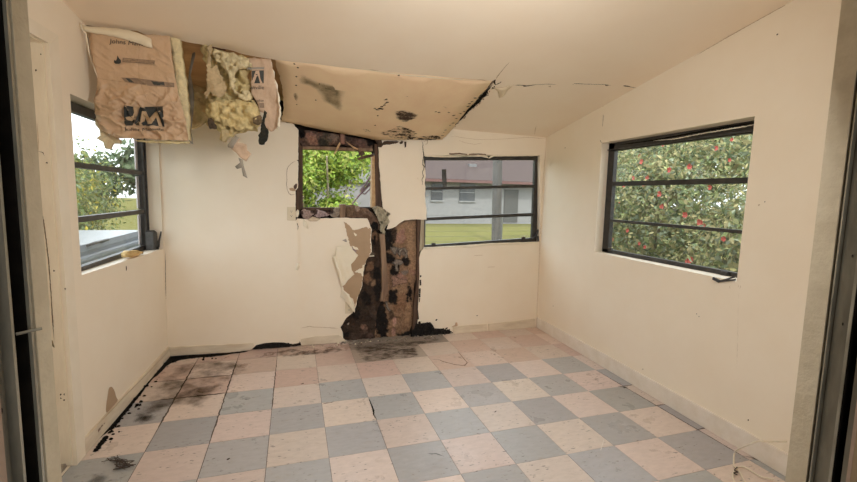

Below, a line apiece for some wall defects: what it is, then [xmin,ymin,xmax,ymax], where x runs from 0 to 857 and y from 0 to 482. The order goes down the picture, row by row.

water stain [305,80,339,105]
water stain [375,98,475,147]
crack [455,85,495,127]
spalling [333,219,424,340]
peeling [92,353,167,432]
water stain [100,351,247,438]